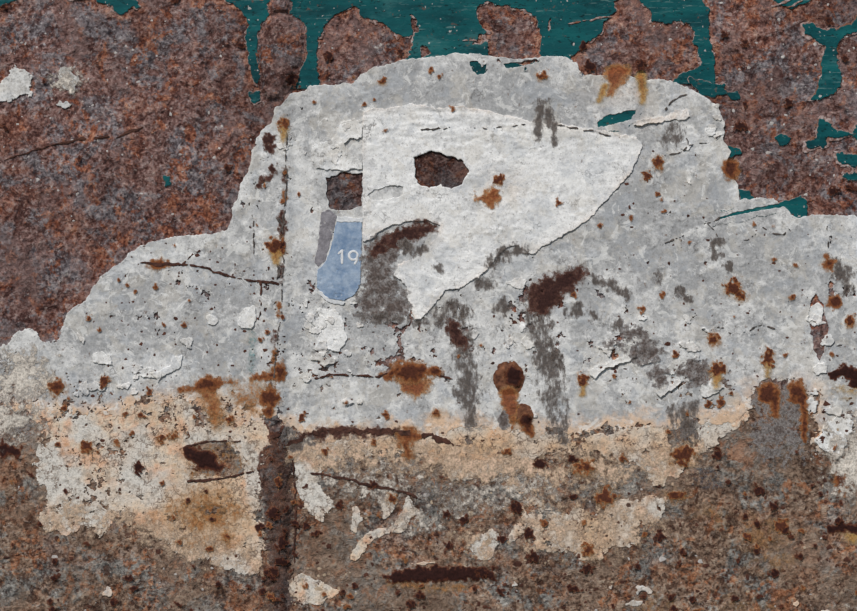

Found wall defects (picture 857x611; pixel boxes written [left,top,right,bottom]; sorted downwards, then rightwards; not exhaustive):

peeling [0,65,46,103]
peeling [225,0,270,106]
rust [571,0,700,104]
rust [705,0,857,226]
peeling [800,15,857,102]
rust [0,0,307,353]
crack [276,114,288,233]
crack [140,221,285,378]
damp [474,241,529,291]
rust [491,361,539,438]
damp [492,265,630,446]
damp [602,316,712,389]